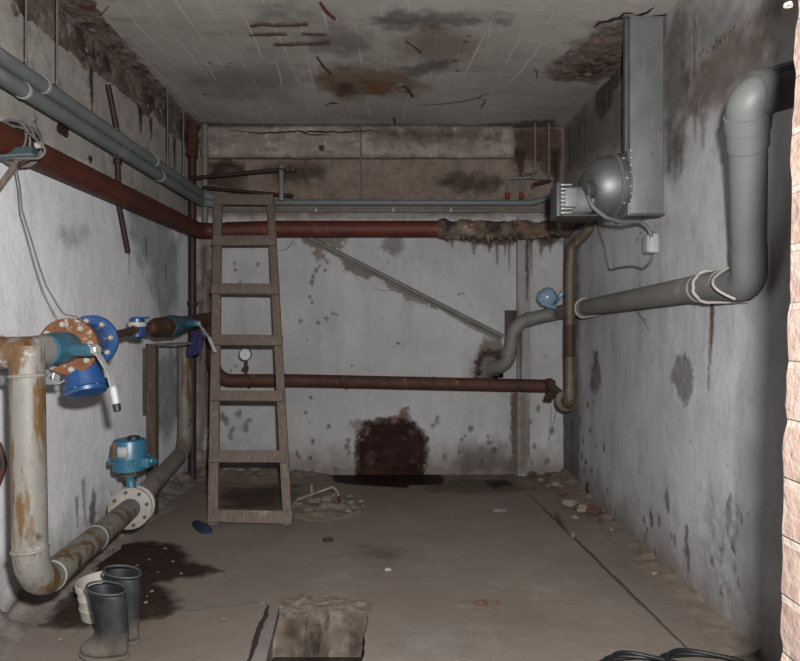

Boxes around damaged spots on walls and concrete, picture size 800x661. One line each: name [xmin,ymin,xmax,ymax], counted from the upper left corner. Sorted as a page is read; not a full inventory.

spalling [11,0,193,168]
spalling [550,17,628,115]
damp [665,21,764,127]
crack [230,129,380,137]
spalling [475,348,501,378]
damp [672,355,692,401]
spalling [345,407,429,475]
damp [47,591,89,628]
damp [93,541,219,620]